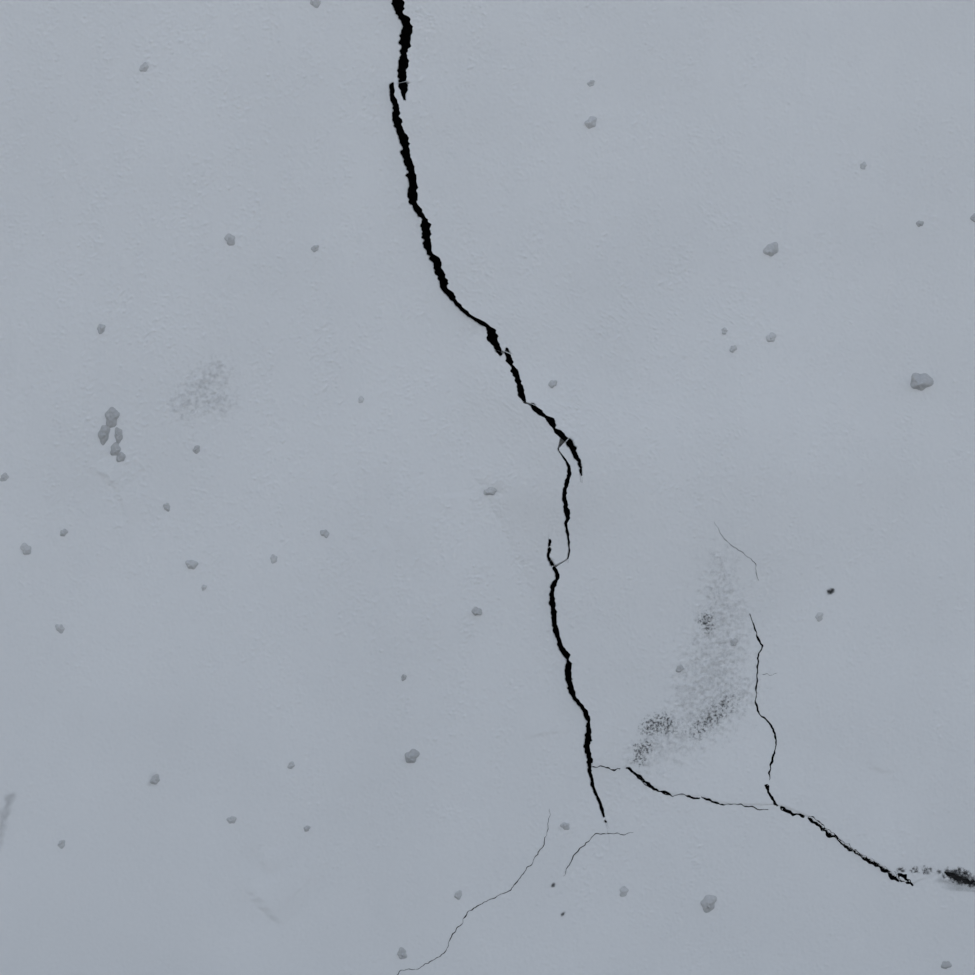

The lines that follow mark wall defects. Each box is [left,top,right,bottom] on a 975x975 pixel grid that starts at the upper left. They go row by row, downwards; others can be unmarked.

crack [389,0,913,886]
crack [398,819,549,974]